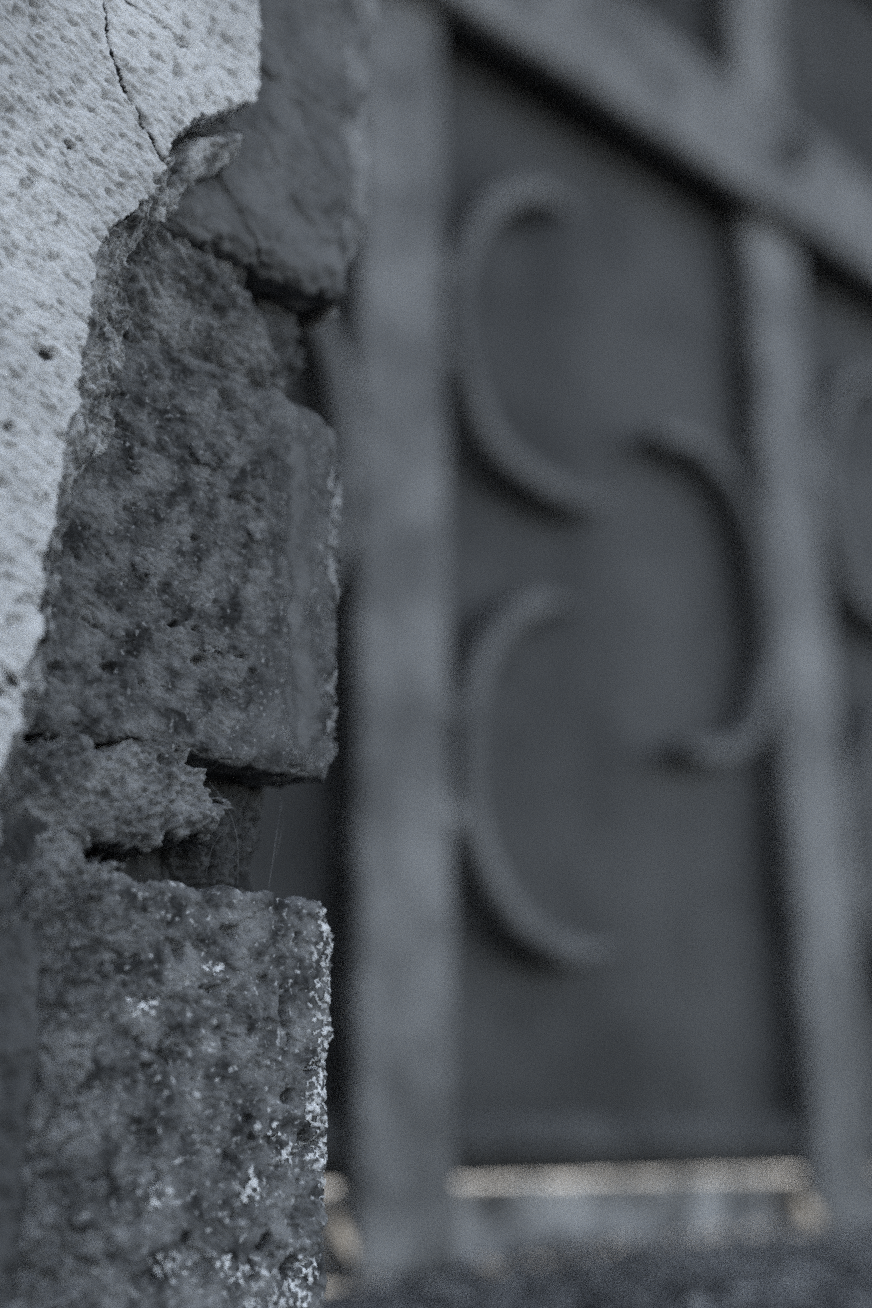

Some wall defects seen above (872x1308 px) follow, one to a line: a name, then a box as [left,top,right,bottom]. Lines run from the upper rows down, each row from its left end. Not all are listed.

crack [102,0,189,162]
spalling [0,129,287,843]
spalling [325,463,343,609]
spalling [325,654,338,764]
spalling [85,856,139,884]